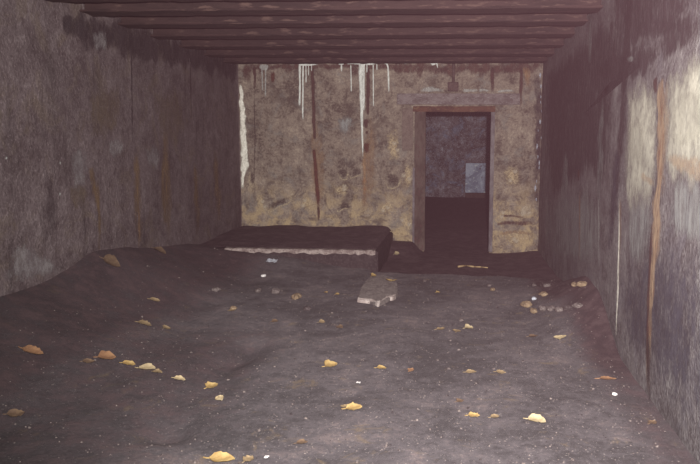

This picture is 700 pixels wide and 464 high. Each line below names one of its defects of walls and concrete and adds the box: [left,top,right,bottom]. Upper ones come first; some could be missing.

damp [239,86,249,185]
damp [63,12,538,152]
corrosion [646,78,664,381]